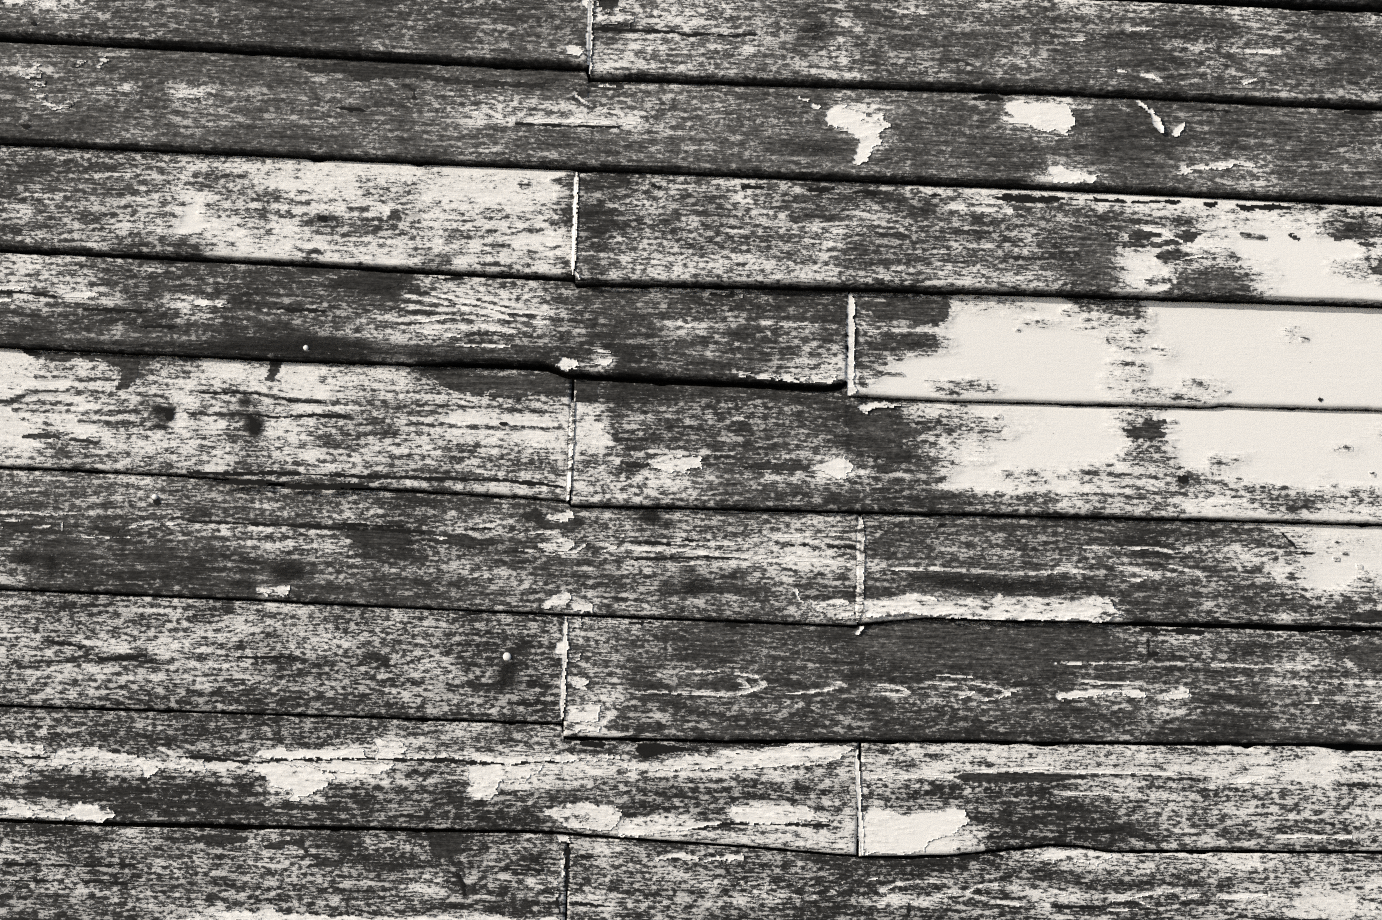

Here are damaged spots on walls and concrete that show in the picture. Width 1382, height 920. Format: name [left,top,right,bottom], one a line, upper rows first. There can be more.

peeling [798,96,890,165]
peeling [972,94,1075,136]
peeling [1135,100,1185,137]
spalling [992,164,1181,205]
peeling [1062,227,1252,294]
peeling [1314,206,1382,274]
peeling [854,293,951,345]
peeling [22,350,141,390]
peeling [1123,419,1167,441]
peeling [0,652,853,830]
peeling [542,801,829,838]
peeling [653,852,744,862]